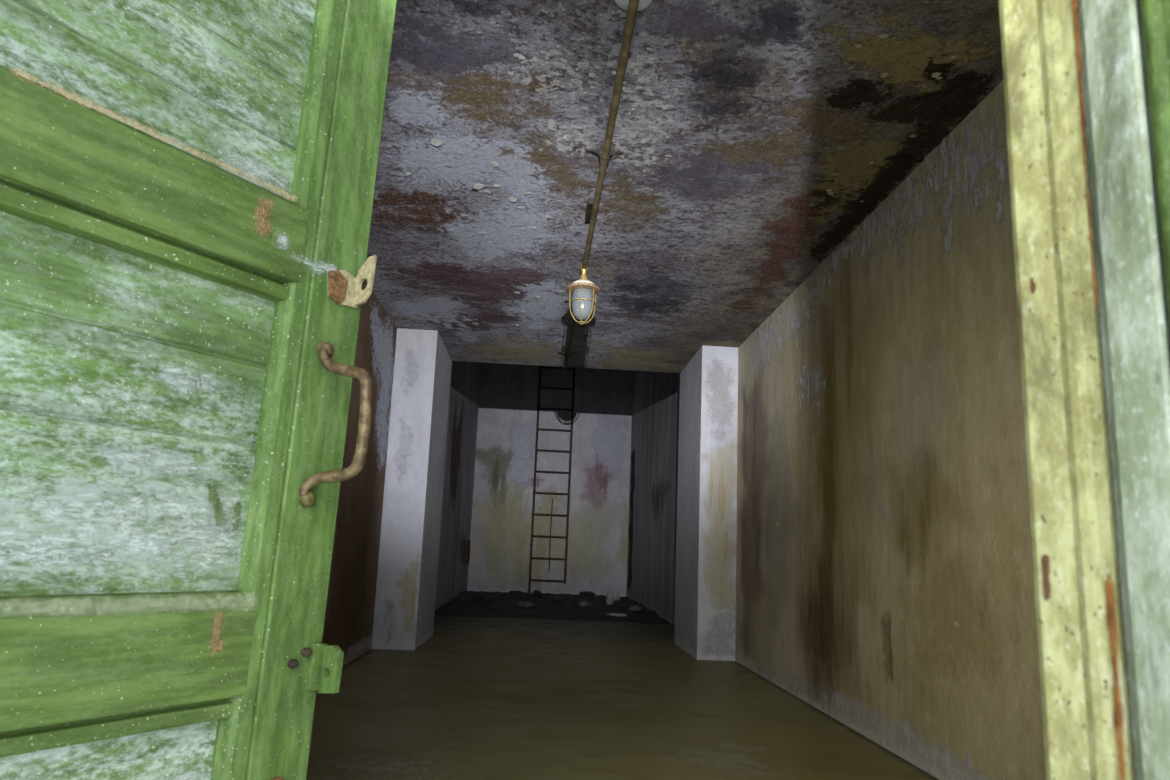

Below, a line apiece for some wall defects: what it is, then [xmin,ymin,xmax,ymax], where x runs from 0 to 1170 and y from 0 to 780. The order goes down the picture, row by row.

rust [371,185,477,238]
leakage [751,54,1010,370]
rust [368,256,566,333]
leakage [477,448,601,588]